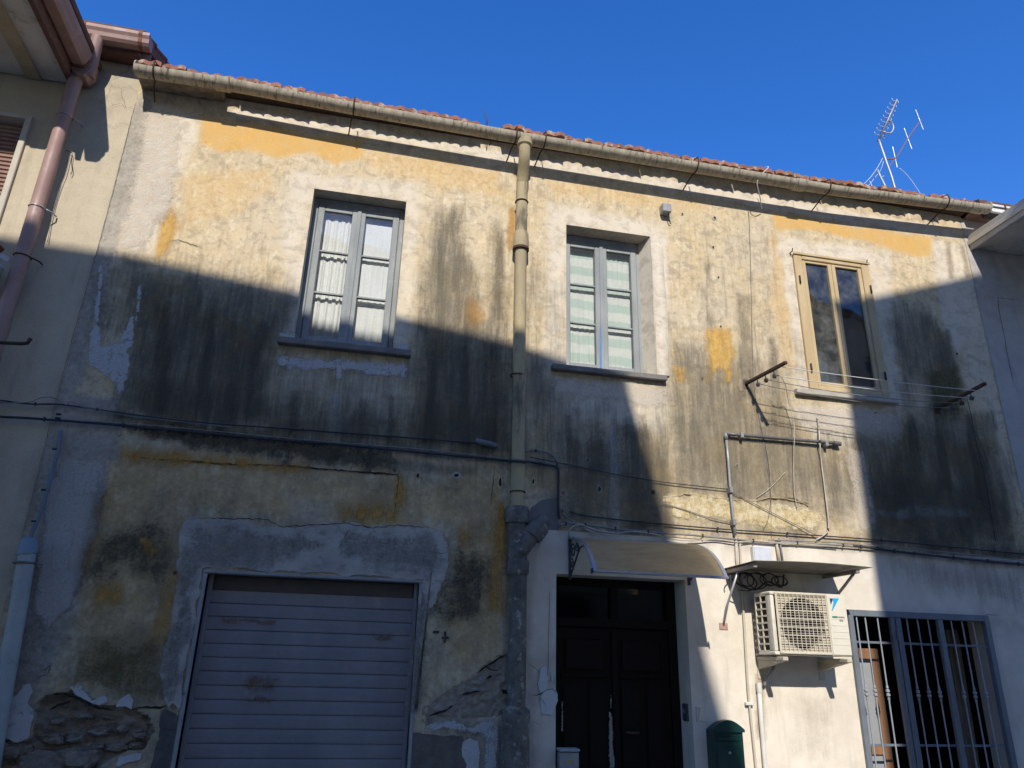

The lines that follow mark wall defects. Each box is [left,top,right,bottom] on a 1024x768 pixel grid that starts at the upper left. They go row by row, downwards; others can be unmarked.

peeling [88,265,142,395]
peeling [277,355,407,379]
leakage [79,524,318,700]
spalling [1,684,167,768]
spalling [421,652,508,768]
peeling [536,666,563,731]